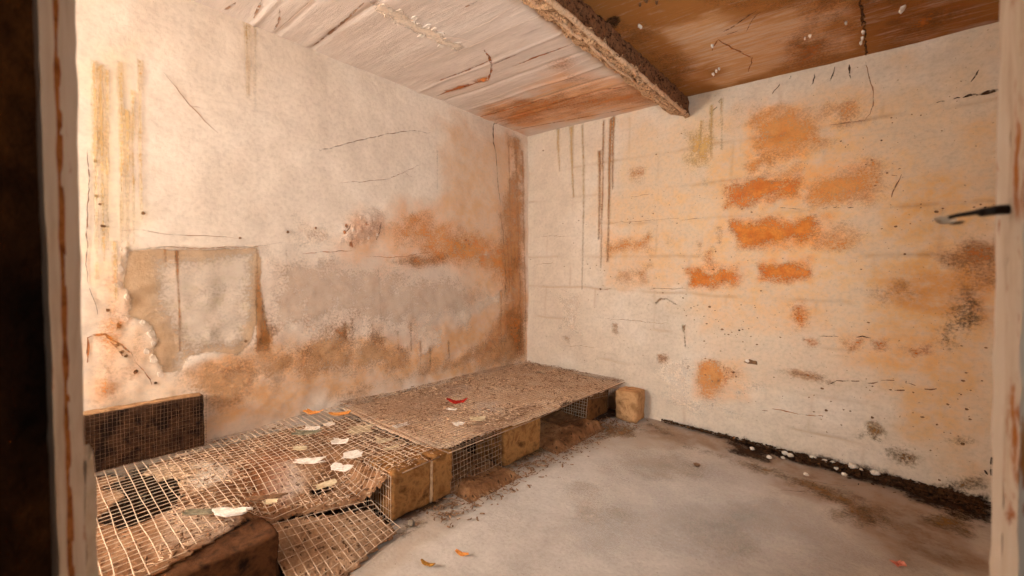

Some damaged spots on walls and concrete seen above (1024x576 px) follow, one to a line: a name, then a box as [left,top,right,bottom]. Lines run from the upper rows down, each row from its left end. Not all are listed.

spalling [522,0,690,119]
crack [772,0,874,125]
crack [166,75,218,133]
rust [724,158,878,209]
rust [730,216,817,248]
water stain [191,138,526,403]
rust [759,263,811,283]
flaking render [106,237,261,384]
rust [698,361,724,397]
water stain [868,422,882,439]
water stain [688,426,992,538]